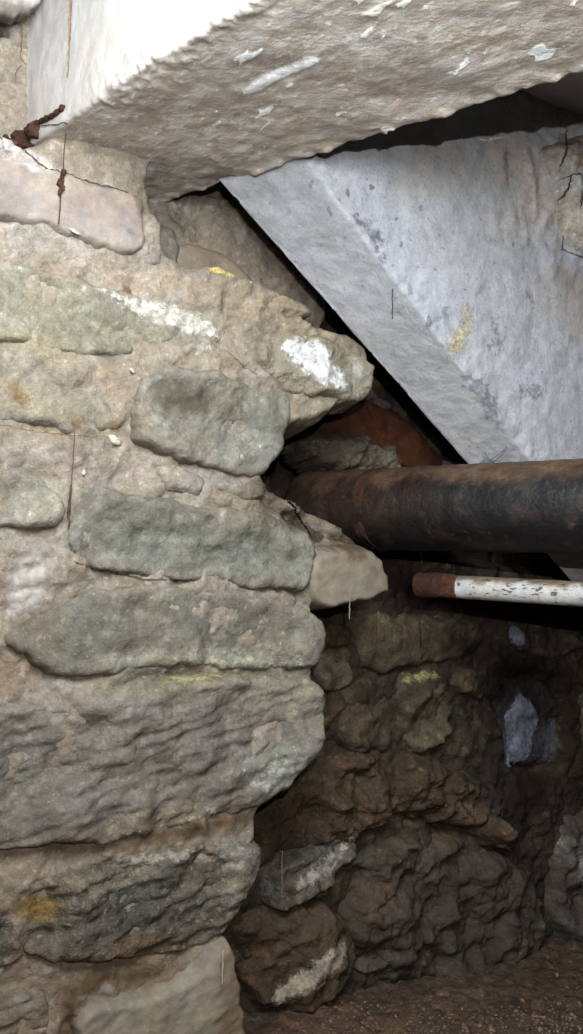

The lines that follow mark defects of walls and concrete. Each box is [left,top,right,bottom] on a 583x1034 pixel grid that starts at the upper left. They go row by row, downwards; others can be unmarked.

crack [15,12,35,84]
rust [3,104,65,149]
crack [0,136,127,193]
crack [557,130,583,210]